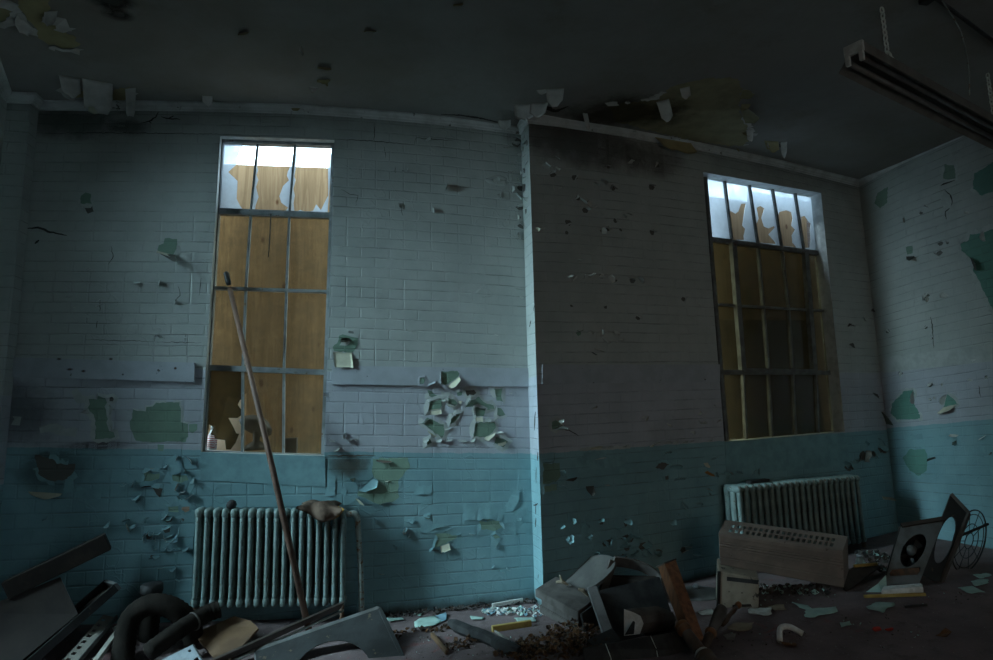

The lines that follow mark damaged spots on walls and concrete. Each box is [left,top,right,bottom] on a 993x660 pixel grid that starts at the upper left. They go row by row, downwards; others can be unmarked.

peeling [0,0,83,55]
peeling [56,75,138,117]
peeling [578,77,787,158]
peeling [441,88,572,239]
crack [28,227,67,244]
peeling [934,224,993,316]
peeling [417,368,513,452]
peeling [881,382,960,426]
peeling [130,400,197,501]
peeling [325,456,410,507]
peeling [400,490,532,553]